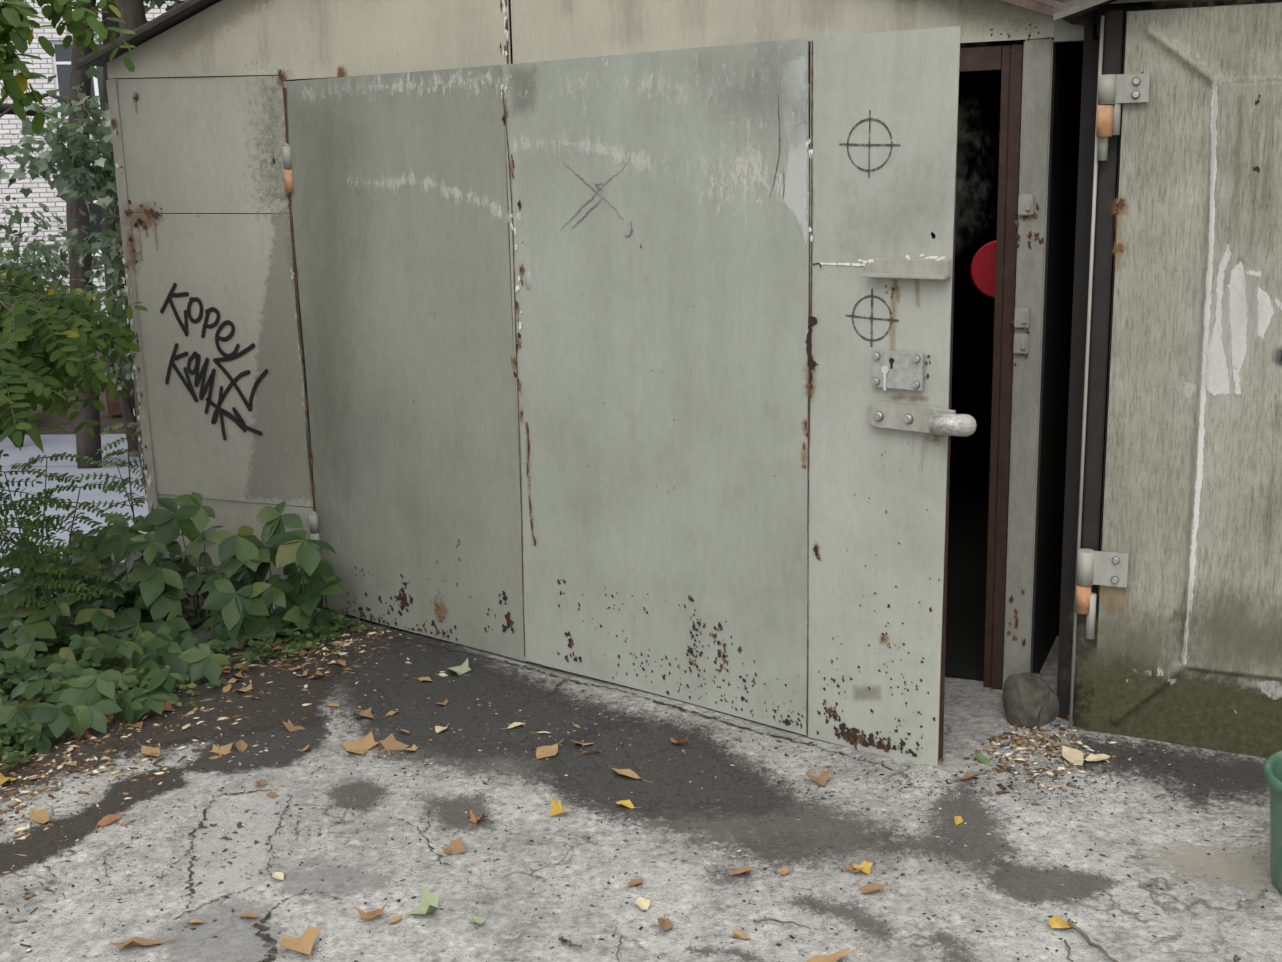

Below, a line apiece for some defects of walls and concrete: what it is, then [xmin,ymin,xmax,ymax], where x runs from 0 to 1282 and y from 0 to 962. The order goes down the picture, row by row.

rust [124,200,163,265]
rust [806,40,814,316]
rust [501,76,536,592]
rust [802,375,821,560]
crack [168,612,894,770]
crack [0,665,341,962]
crack [400,804,472,875]